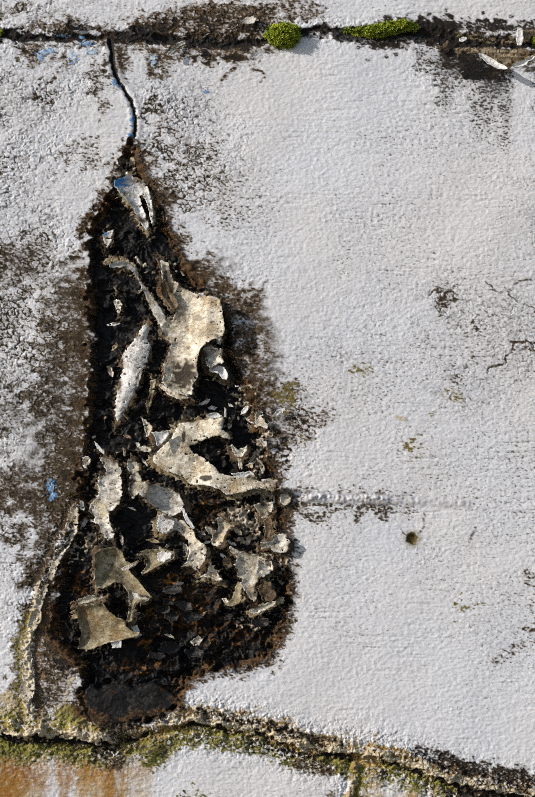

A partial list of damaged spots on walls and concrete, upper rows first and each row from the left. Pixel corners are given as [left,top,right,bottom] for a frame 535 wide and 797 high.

damp [0,2,115,123]
crack [0,14,282,149]
crack [299,22,535,50]
damp [357,9,535,151]
damp [53,133,124,175]
damp [114,0,418,539]
damp [0,188,107,724]
peeling [43,113,299,733]
damp [191,607,298,690]
crack [0,502,535,797]
corrosion [0,758,42,797]
corrosion [56,757,123,797]